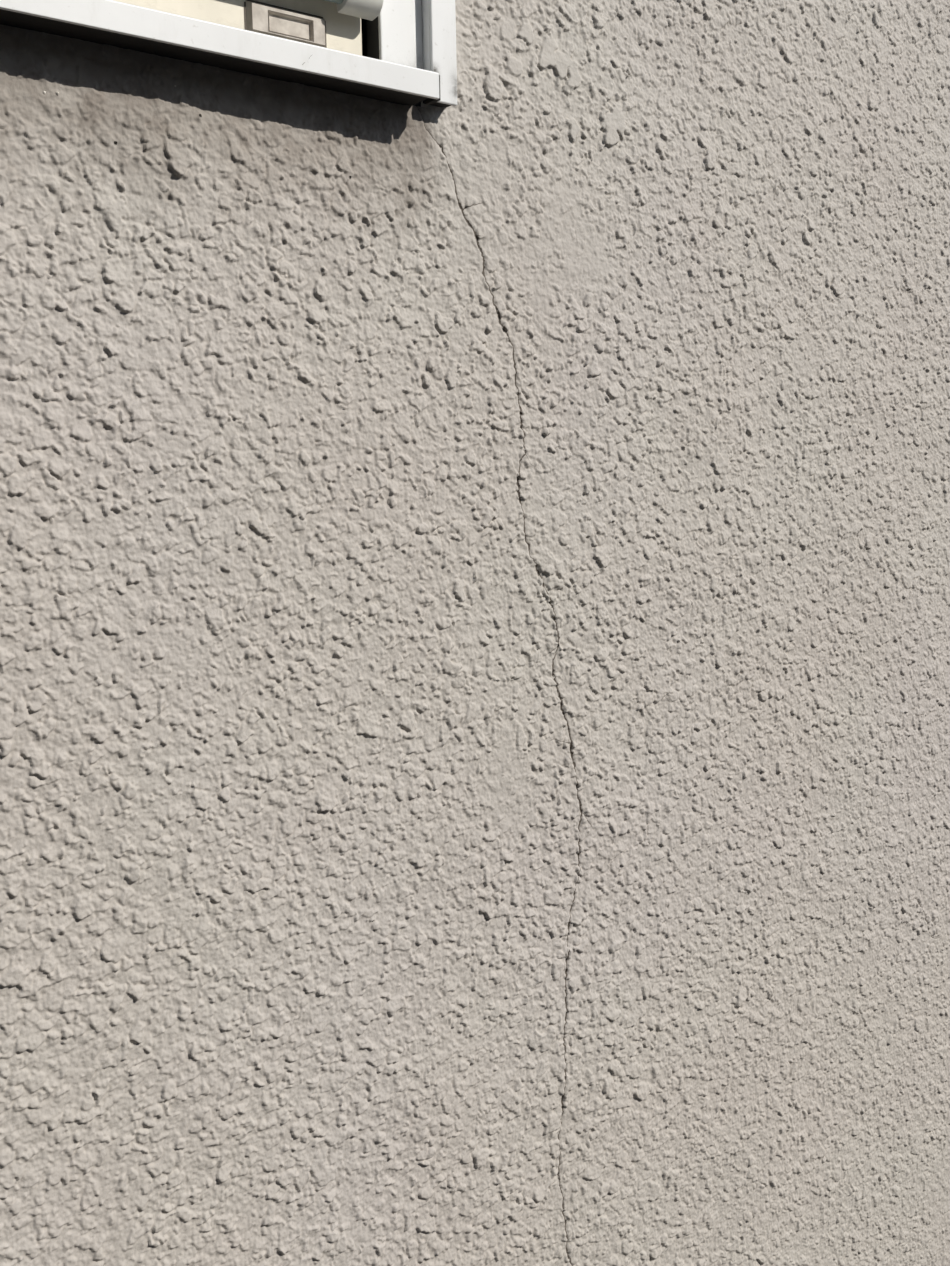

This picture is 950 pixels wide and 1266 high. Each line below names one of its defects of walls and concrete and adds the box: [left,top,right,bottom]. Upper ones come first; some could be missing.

crack [416,106,592,1265]